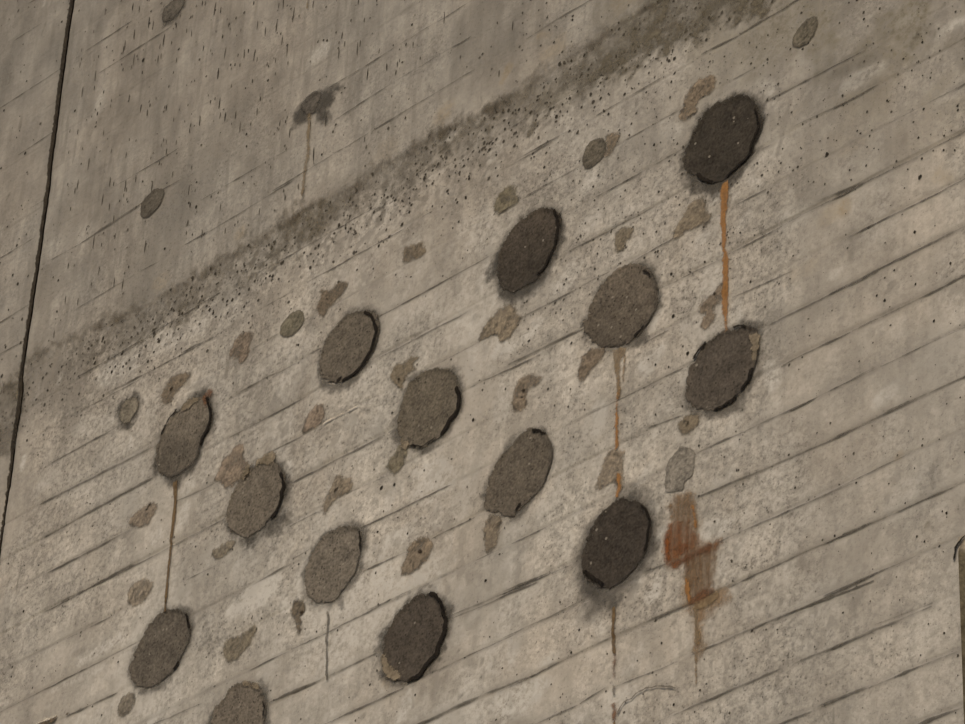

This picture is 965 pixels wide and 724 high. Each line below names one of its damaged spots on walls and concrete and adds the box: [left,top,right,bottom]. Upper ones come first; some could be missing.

water stain [565,0,771,84]
water stain [301,114,310,196]
water stain [681,92,765,195]
water stain [487,216,565,302]
corrosion [720,180,729,331]
water stain [416,409,462,454]
corrosion [613,348,626,449]
water stain [688,378,755,417]
water stain [163,389,215,612]
water stain [245,473,289,548]
corrosion [664,493,728,683]